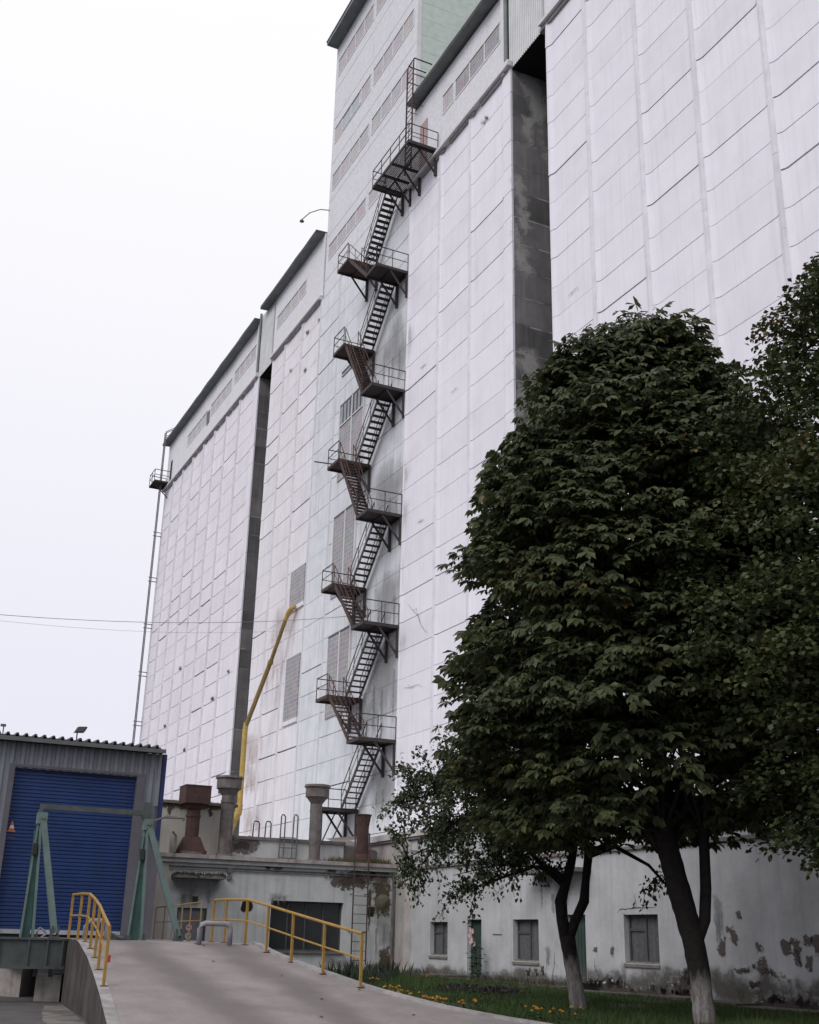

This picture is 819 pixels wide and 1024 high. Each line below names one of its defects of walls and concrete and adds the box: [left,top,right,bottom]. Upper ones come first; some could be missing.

water stain [520,74,547,146]
water stain [513,176,532,274]
flaking render [325,869,376,891]
flaking render [717,910,742,957]
flaking render [780,934,819,972]